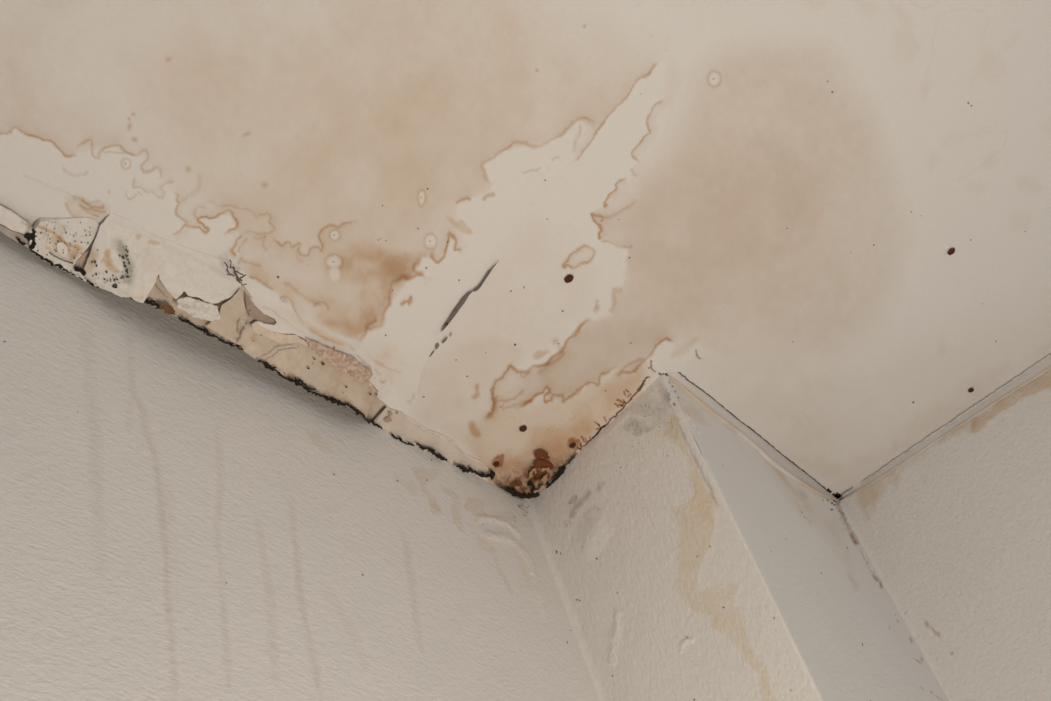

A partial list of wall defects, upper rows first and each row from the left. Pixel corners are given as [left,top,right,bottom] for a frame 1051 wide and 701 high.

flaking render [28,217,100,271]
leakage [0,0,1051,530]
corrosion [468,360,669,499]
leakage [622,383,861,701]